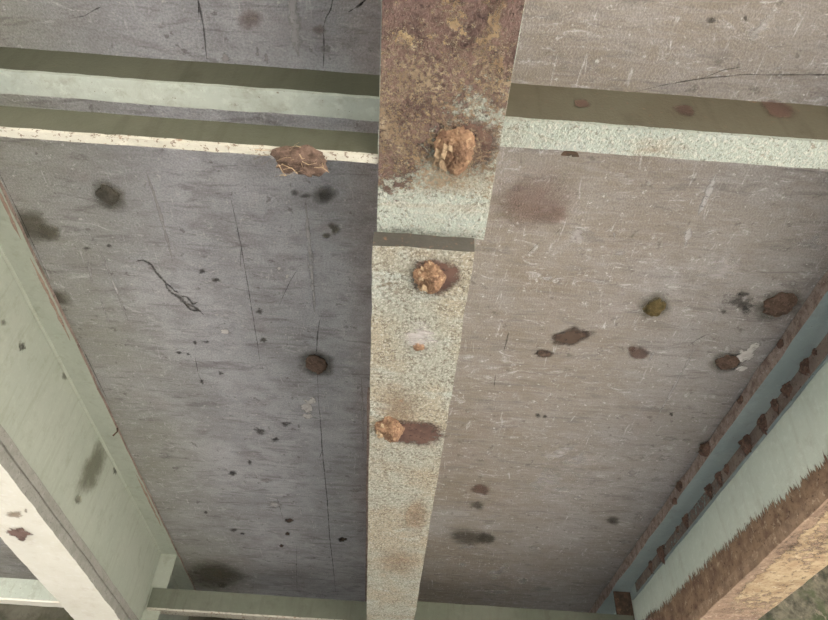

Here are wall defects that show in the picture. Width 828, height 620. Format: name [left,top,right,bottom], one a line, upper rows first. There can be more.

crack [323,0,365,65]
rust [378,0,525,211]
crack [636,67,823,92]
rust [629,347,648,359]
leakage [84,451,102,485]
crack [317,376,336,591]
rust [635,333,828,592]
peeling [7,527,33,541]
leakage [455,532,493,548]
rust [645,453,828,620]